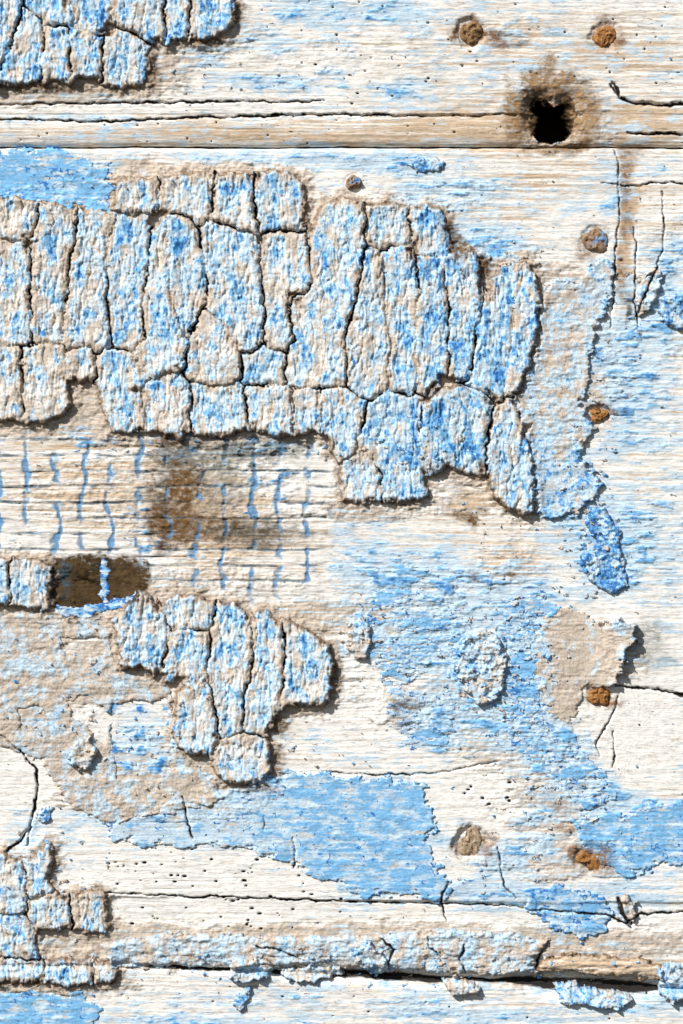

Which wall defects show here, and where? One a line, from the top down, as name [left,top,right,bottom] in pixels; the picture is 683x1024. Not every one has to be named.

peeling [0,0,238,90]
damp [503,55,599,154]
crack [610,84,683,107]
crack [609,163,683,323]
peeling [0,145,629,594]
damp [147,433,279,549]
crack [0,170,515,739]
peeling [0,556,460,904]
crack [0,746,46,977]
peeling [0,841,122,1024]
rust [569,846,608,868]
peeling [552,980,634,1011]